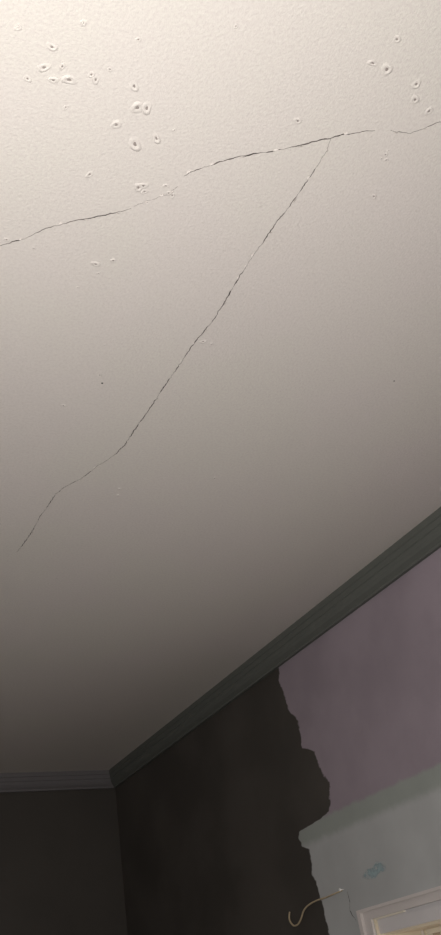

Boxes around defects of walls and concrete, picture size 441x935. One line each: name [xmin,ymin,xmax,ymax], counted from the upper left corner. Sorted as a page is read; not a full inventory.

crack [1,122,438,552]